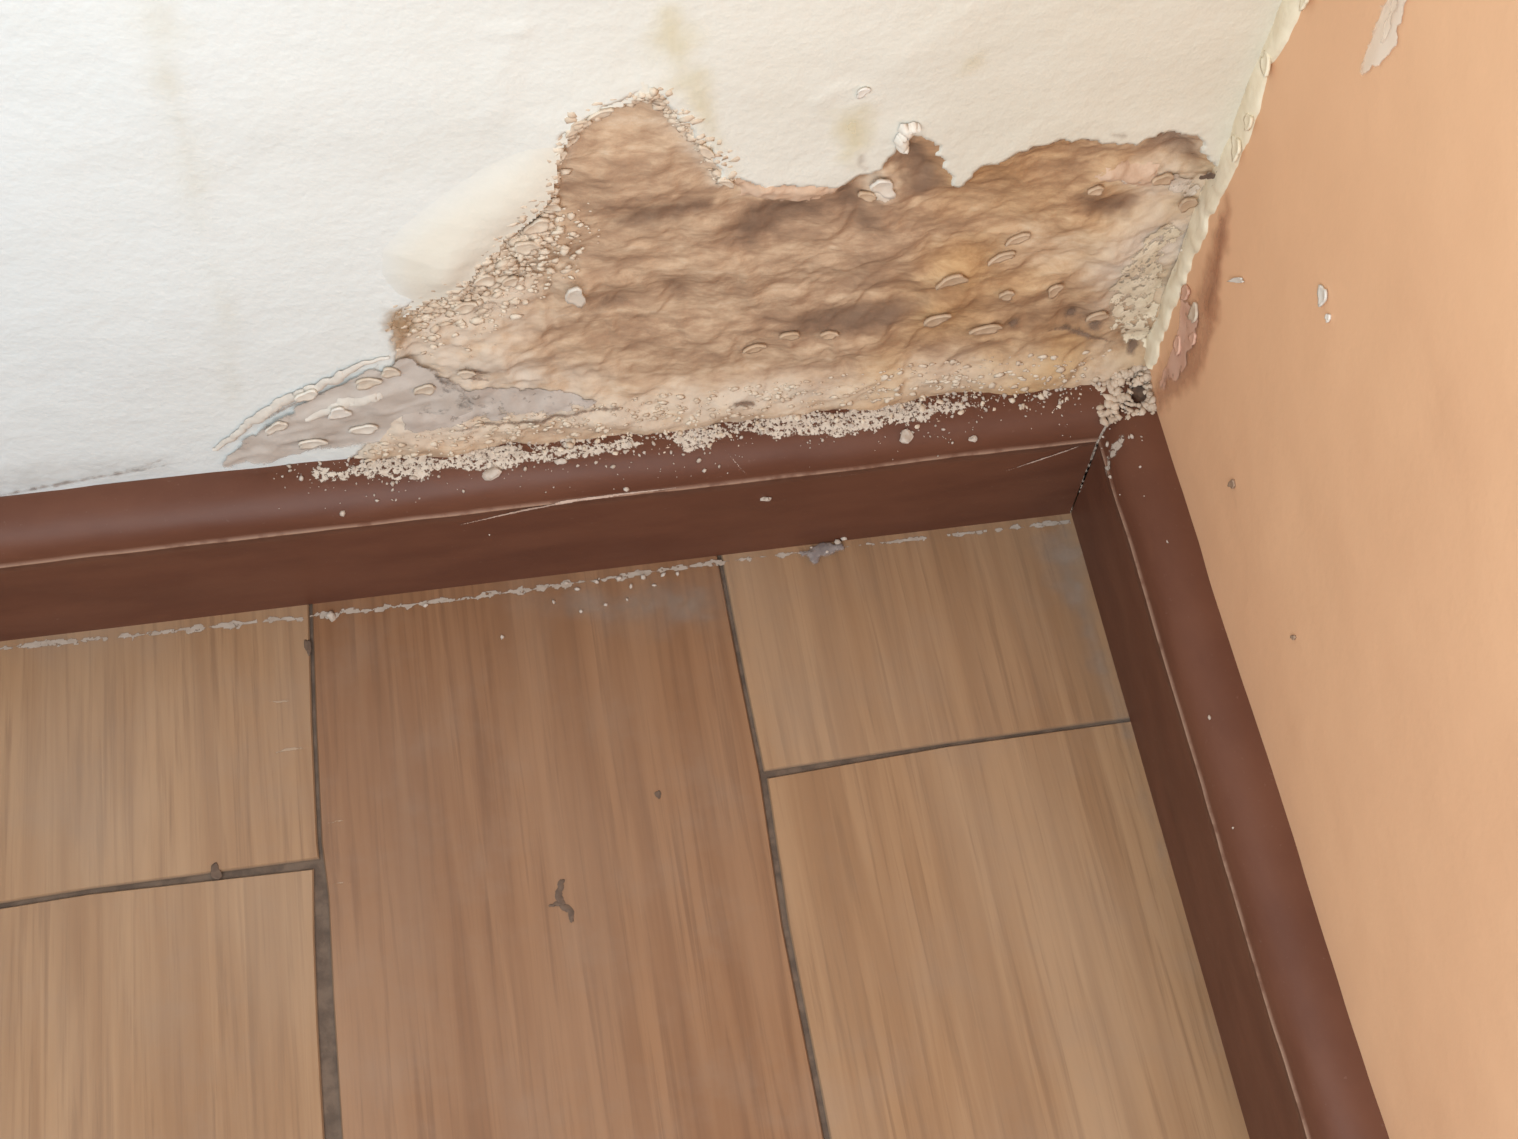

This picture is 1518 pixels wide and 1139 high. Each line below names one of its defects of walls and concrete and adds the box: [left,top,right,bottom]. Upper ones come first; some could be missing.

flaking render [212,87,1253,481]
water stain [1158,220,1225,403]
water stain [312,436,643,483]
water stain [669,394,981,453]